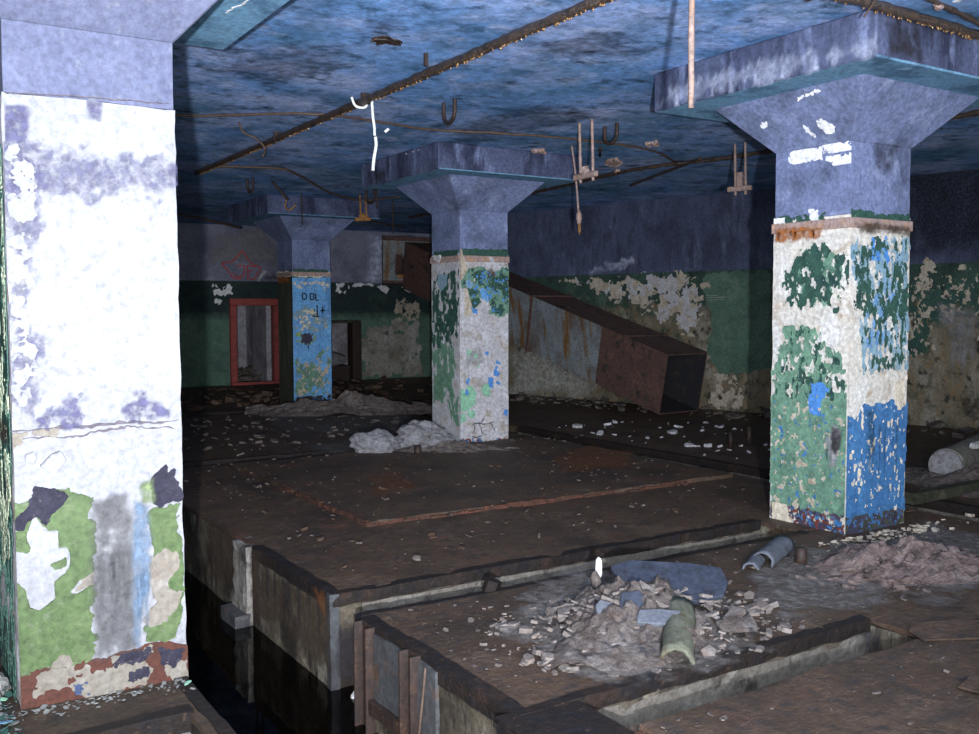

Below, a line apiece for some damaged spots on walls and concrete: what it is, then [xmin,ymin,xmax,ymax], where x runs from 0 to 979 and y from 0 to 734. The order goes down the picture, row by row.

flaking render [774,209,826,224]
peeling [851,208,910,221]
corrosion [775,227,821,243]
corrosion [860,223,910,236]
flaking render [258,248,509,426]
corrosion [595,326,708,415]
peeling [0,143,195,734]